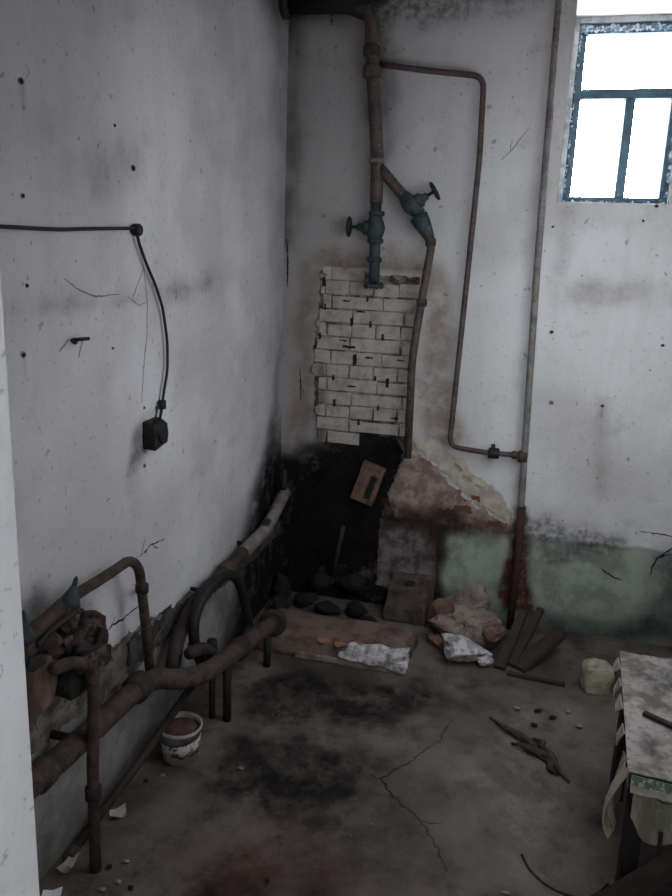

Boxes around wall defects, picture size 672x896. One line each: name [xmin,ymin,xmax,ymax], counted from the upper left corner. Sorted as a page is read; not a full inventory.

spalling [208,521,280,599]
rust [499,513,533,611]
spalling [97,580,205,702]
spalling [29,690,87,756]
crack [371,717,453,871]